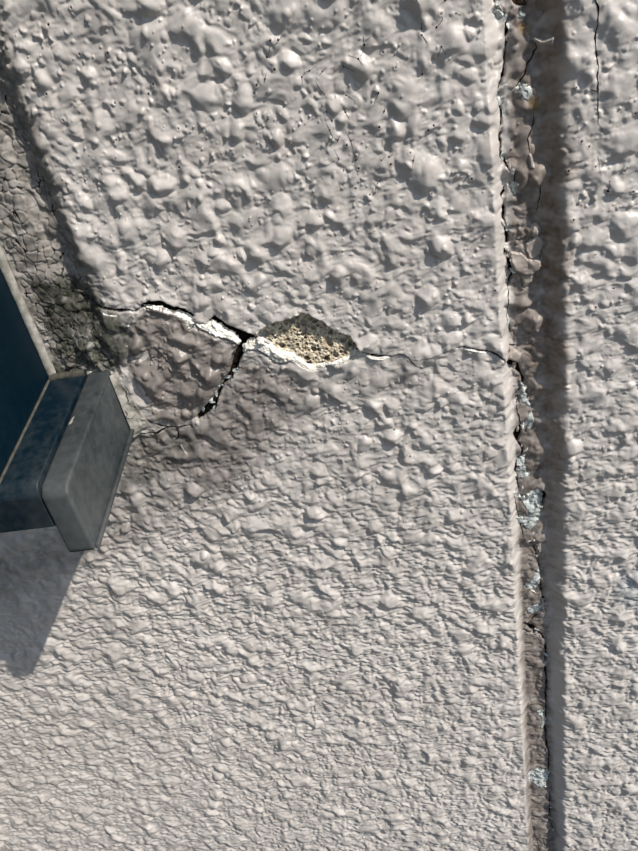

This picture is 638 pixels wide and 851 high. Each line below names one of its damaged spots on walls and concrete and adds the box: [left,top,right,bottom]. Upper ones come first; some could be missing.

crack [304,34,386,184]
leakage [531,23,568,288]
crack [572,0,603,131]
crack [0,171,292,441]
spalling [255,313,358,370]
crack [356,0,552,774]
peeling [516,454,530,479]
peeling [514,382,534,431]
peeling [516,489,544,541]
leakage [537,301,564,433]
crack [532,794,557,849]